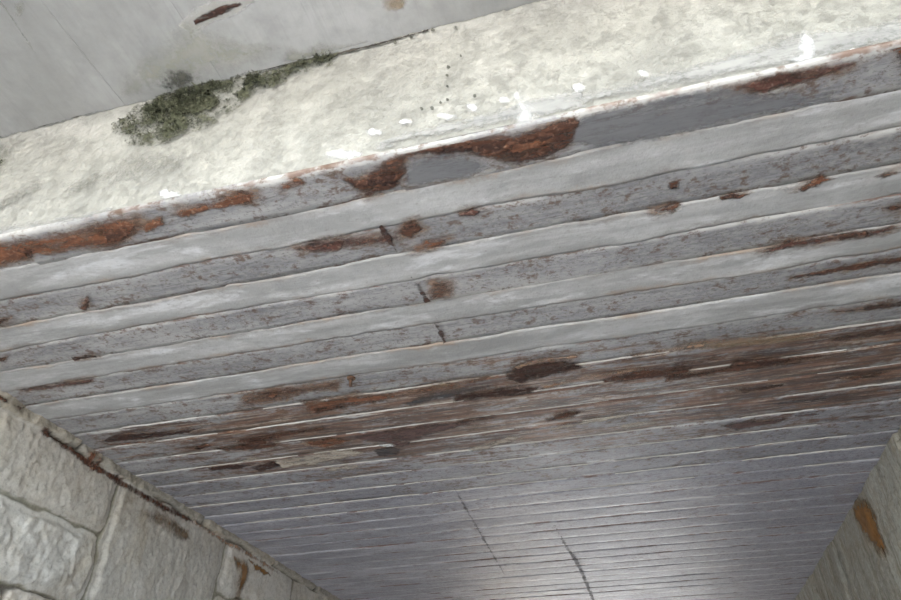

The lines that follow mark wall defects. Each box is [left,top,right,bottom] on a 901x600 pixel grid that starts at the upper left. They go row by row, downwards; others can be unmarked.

rust [729,62,856,96]
peeling [571,91,830,146]
rust [720,191,747,200]
rust [796,176,831,192]
crack [379,225,396,250]
crack [411,277,430,303]
rust [240,333,821,413]
rust [186,428,350,452]
rust [724,419,782,431]
rust [41,427,280,599]
rust [853,500,888,556]
crack [553,525,594,600]